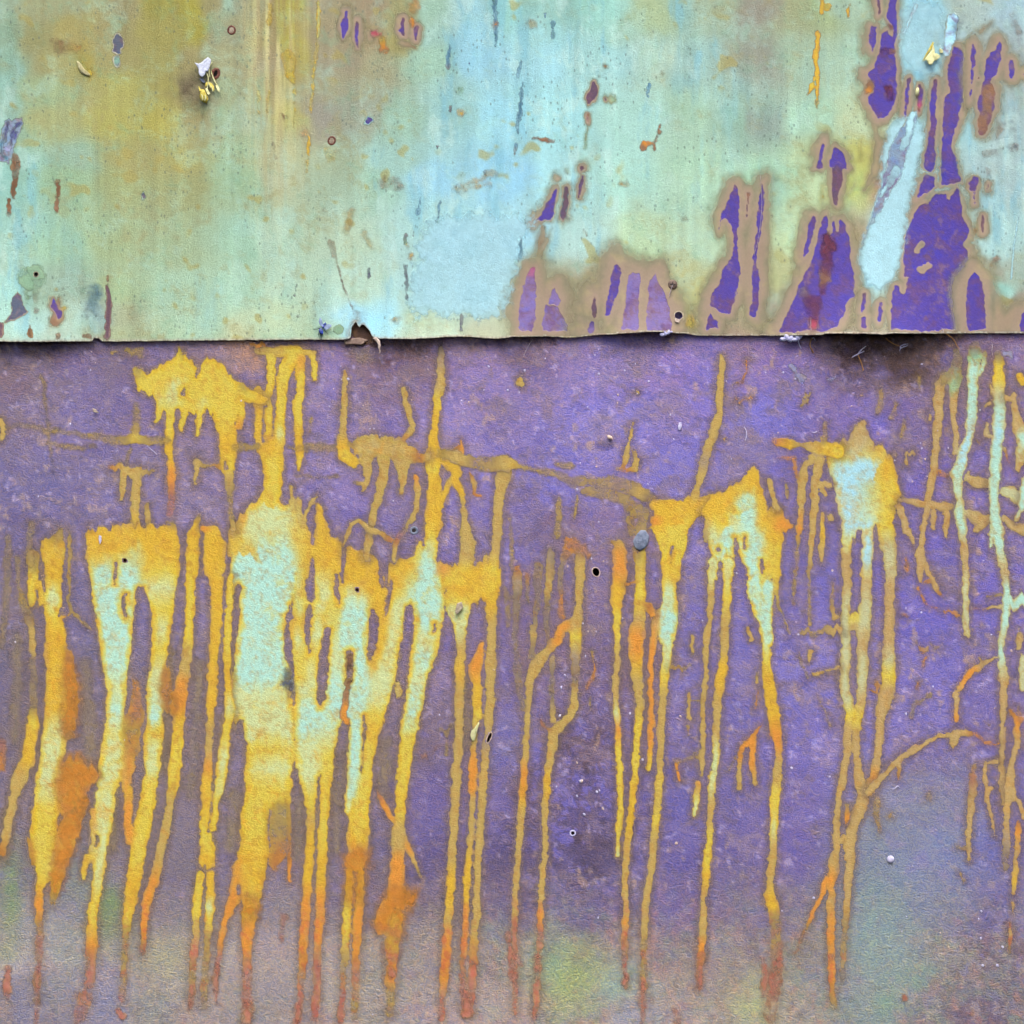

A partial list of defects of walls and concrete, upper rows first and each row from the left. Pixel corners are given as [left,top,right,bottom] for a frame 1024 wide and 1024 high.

corrosion [819,0,831,14]
corrosion [808,30,821,101]
peeling [0,118,24,164]
corrosion [640,124,661,151]
peeling [503,0,1024,337]
peeling [5,292,28,323]
corrosion [339,654,353,725]